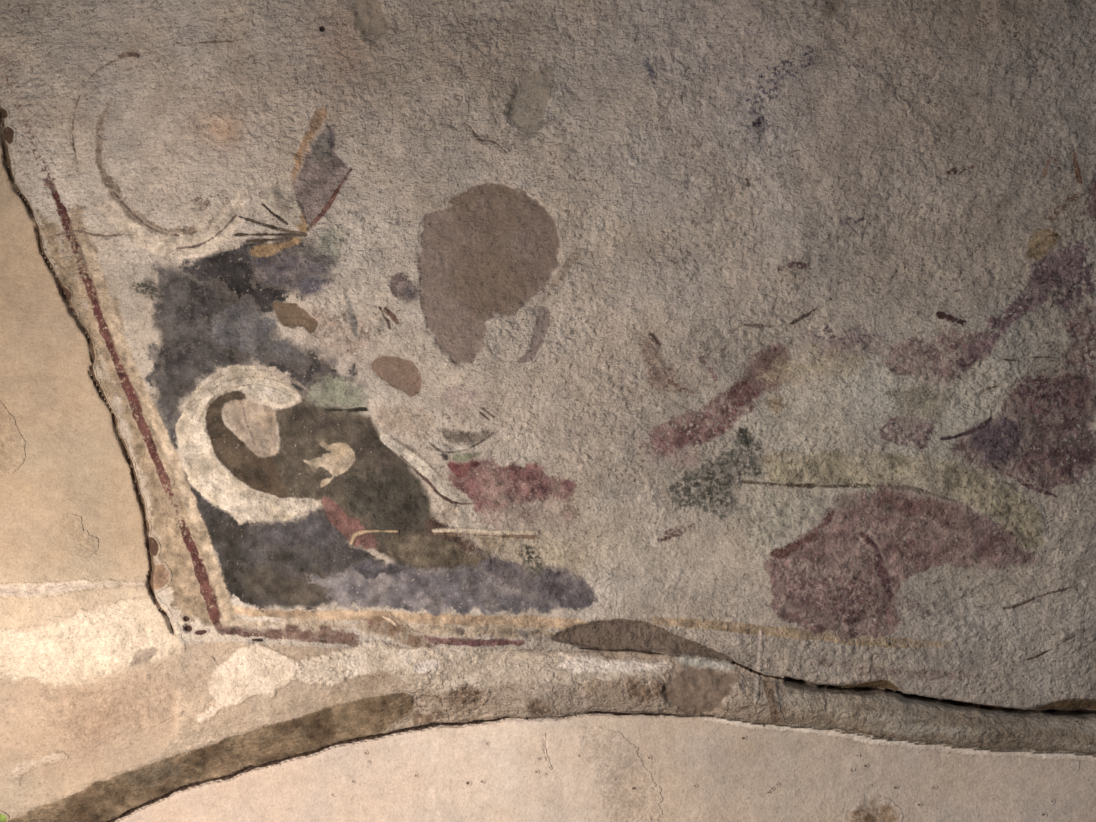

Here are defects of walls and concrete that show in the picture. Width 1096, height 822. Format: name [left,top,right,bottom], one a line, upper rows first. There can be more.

crack [731,660,1096,718]